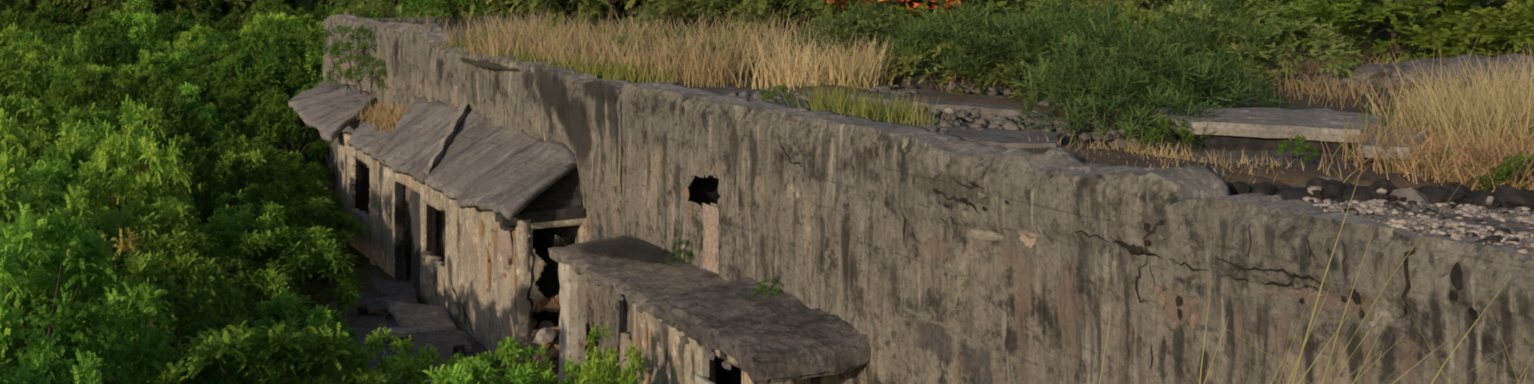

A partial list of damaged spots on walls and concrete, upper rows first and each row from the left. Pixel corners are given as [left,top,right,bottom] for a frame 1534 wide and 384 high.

leakage [523,64,679,194]
leakage [730,126,756,190]
crack [1073,220,1347,303]
leakage [919,323,991,384]
leakage [1159,327,1207,384]
leakage [1429,293,1442,347]
leakage [1464,311,1475,384]
leakage [1500,289,1529,360]